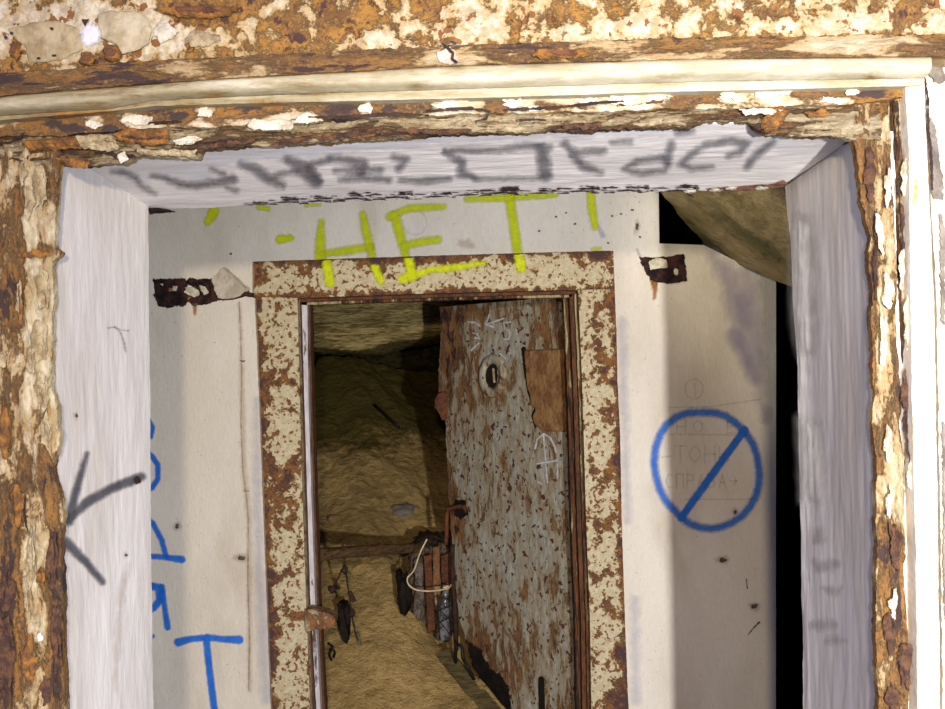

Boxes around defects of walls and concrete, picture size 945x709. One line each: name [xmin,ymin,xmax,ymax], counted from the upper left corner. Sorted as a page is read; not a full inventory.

rust [79,44,122,66]
peeling [4,10,221,63]
peeling [75,119,202,163]
peeling [248,112,323,130]
rust [863,146,877,202]
peeling [875,158,907,256]
peeling [880,249,909,366]
rust [36,527,59,591]
rust [889,519,904,572]
peeling [888,589,898,619]
rust [0,570,62,706]
rust [883,613,913,709]